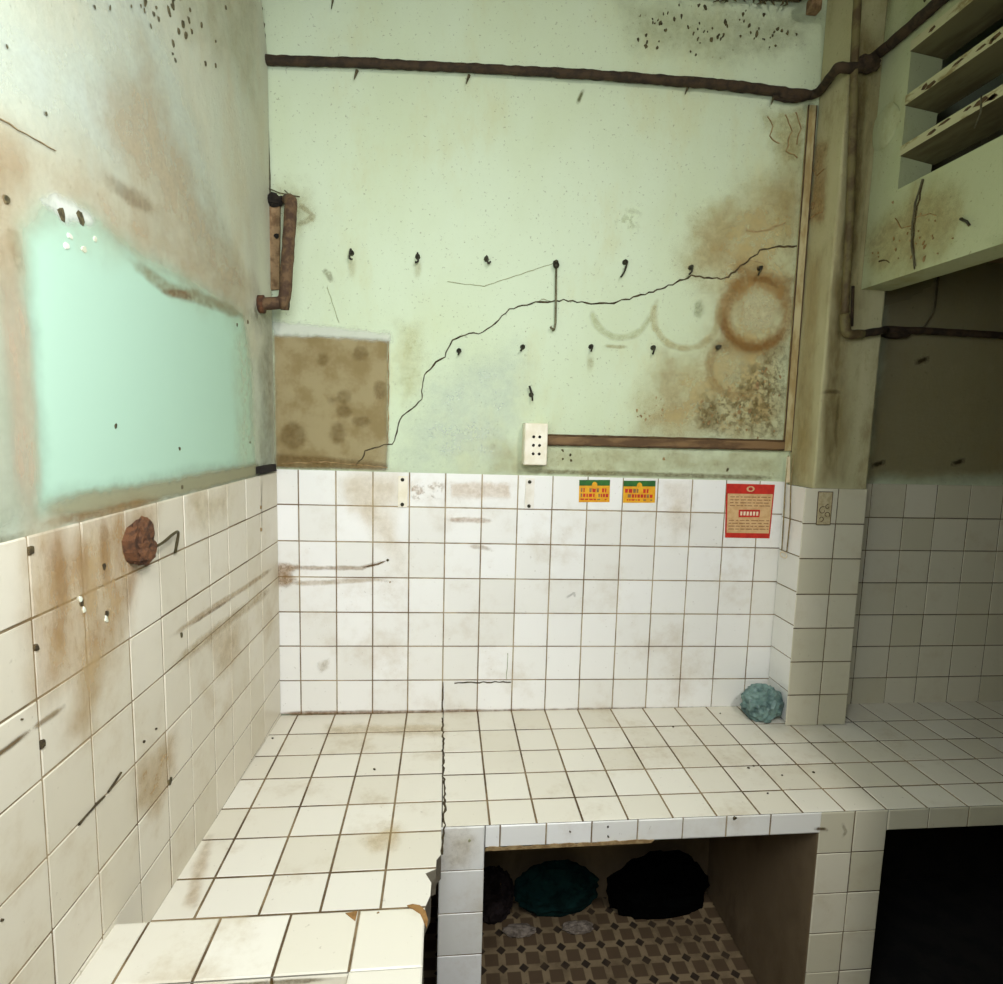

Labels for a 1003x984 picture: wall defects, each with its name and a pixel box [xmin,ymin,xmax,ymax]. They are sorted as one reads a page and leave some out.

mould [637,4,728,56]
mould [739,10,798,48]
crack [0,118,56,151]
peeling [47,194,97,253]
water stain [62,0,241,285]
crack [356,222,797,465]
water stain [636,204,791,432]
corrosion [33,518,131,692]
crack [440,653,511,855]